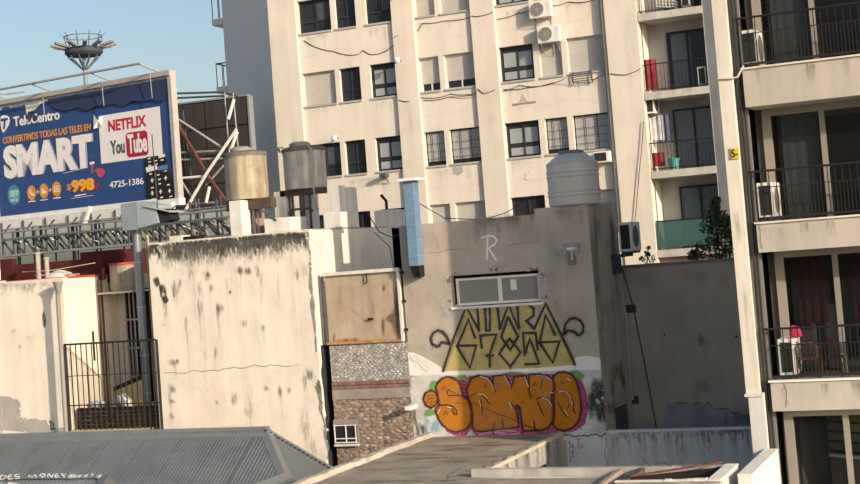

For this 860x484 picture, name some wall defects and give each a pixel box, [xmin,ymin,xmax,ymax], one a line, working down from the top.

leakage [147,232,307,258]
leakage [154,277,175,304]
crack [164,364,298,374]
flaking render [0,396,69,434]
spalling [664,401,751,428]